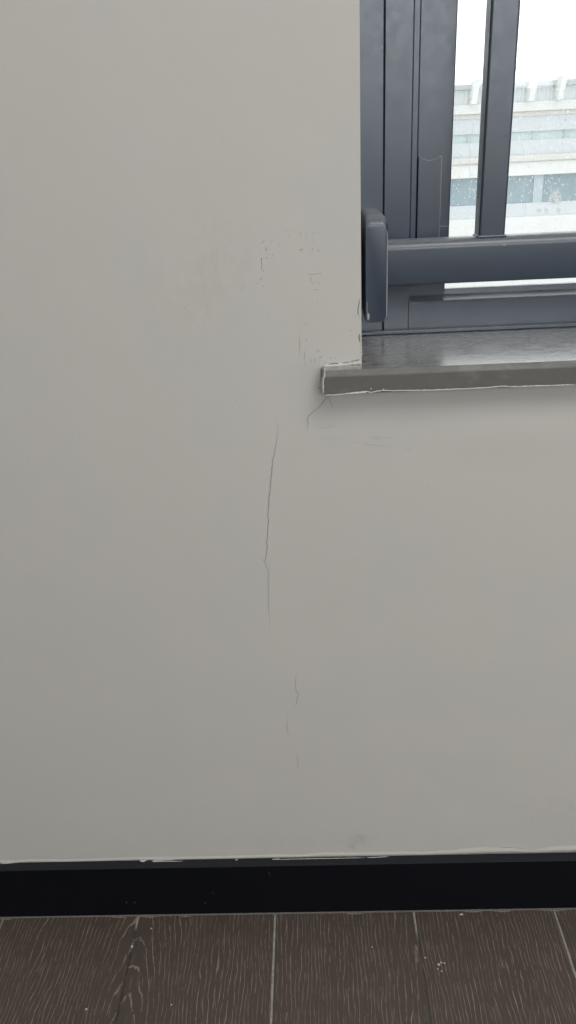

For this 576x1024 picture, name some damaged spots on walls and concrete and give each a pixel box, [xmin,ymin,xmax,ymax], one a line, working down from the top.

crack [264,446,276,609]